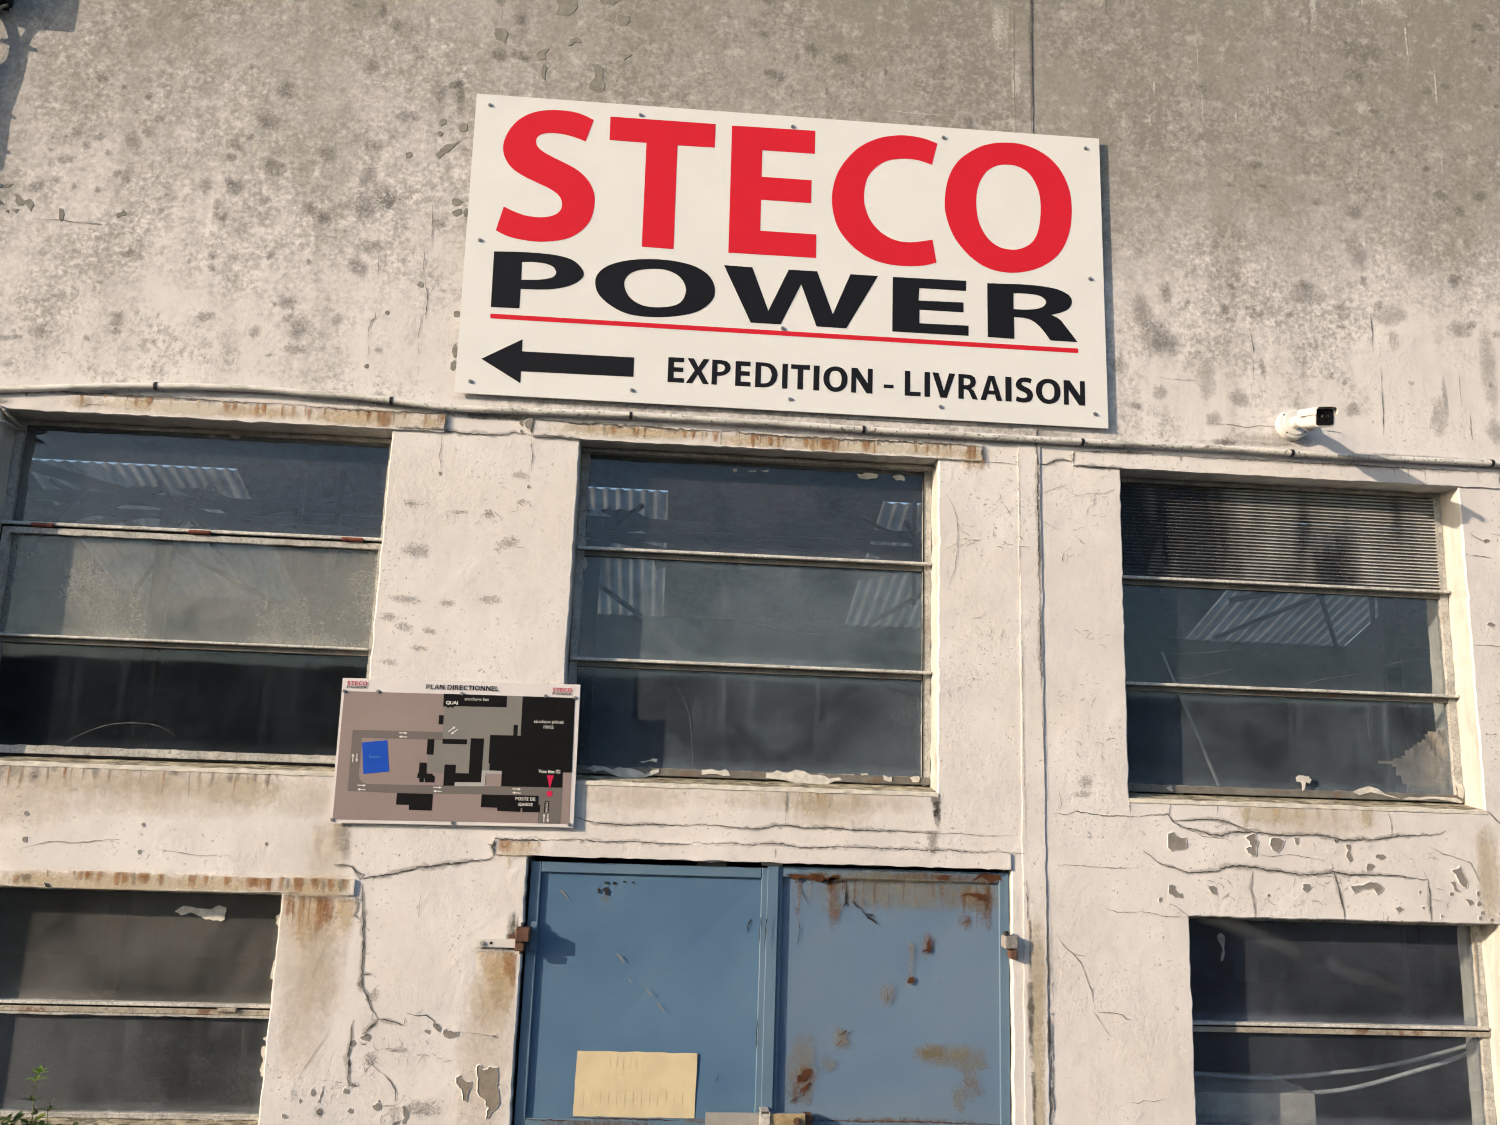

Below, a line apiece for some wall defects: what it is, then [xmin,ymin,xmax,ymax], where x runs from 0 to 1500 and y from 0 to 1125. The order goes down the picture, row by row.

crack [1013,2,1032,127]
crack [48,376,1484,1122]
crack [20,839,119,849]
corrosion [73,872,163,884]
corrosion [248,877,332,929]
corrosion [786,873,877,944]
peeling [1167,831,1189,852]
peeling [1244,833,1299,857]
peeling [1333,839,1386,895]
peeling [1449,865,1500,923]
peeling [455,1064,501,1120]
corrosion [528,1117,690,1125]